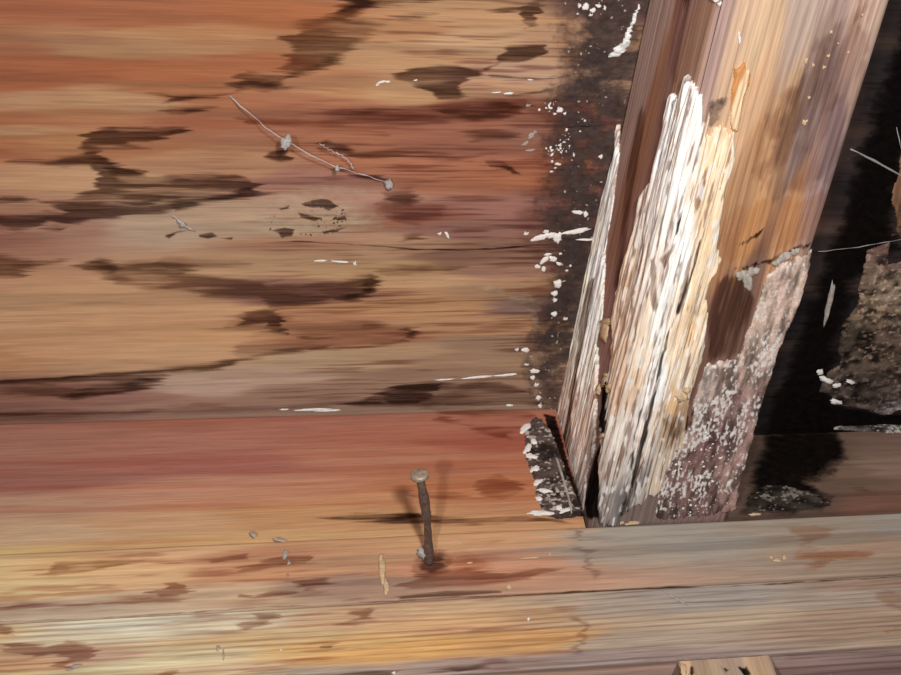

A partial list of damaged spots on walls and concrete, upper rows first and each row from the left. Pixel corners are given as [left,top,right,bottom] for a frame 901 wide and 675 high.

leakage [508,46,546,56]
leakage [412,68,480,95]
leakage [91,130,189,144]
leakage [51,158,257,208]
leakage [0,204,133,224]
leakage [270,201,346,236]
leakage [515,0,650,519]
leakage [655,39,901,520]
spalling [596,373,613,439]